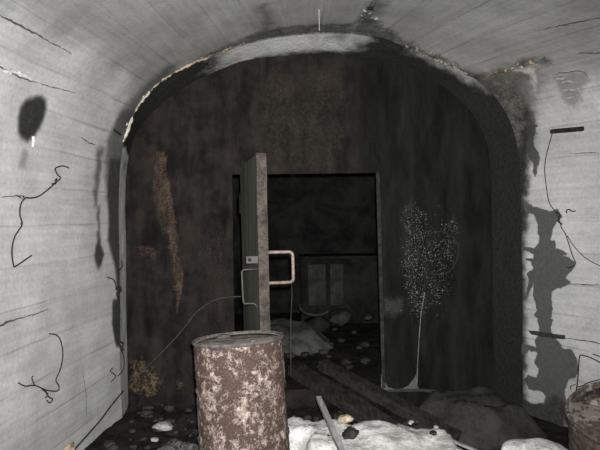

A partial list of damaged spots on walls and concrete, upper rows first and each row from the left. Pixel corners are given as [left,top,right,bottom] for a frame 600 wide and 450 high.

crack [0,15,71,54]
crack [538,17,600,31]
crack [0,66,74,93]
spalling [123,55,212,142]
spalling [393,41,537,147]
damp [526,121,540,177]
rust [154,153,182,303]
damp [401,207,455,312]
crack [0,309,48,327]
rust [131,361,160,397]